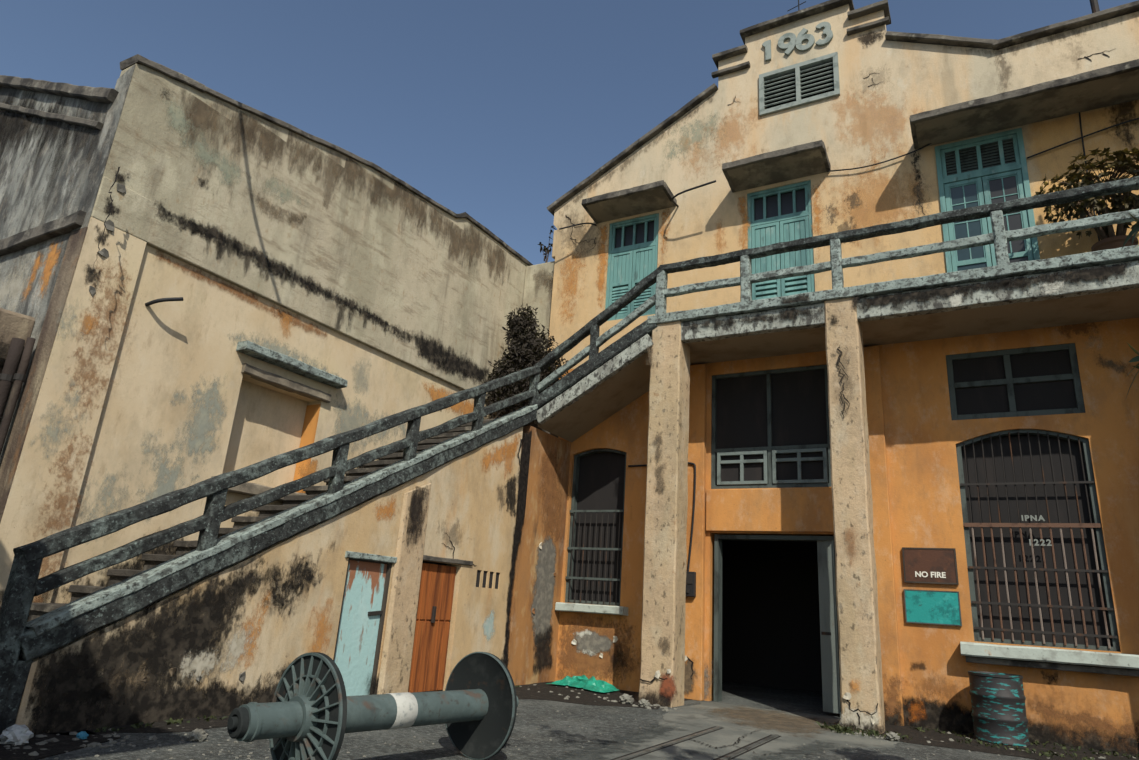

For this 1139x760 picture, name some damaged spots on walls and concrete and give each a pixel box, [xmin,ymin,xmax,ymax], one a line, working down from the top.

damp [0,95,96,154]
damp [183,96,507,277]
rust [23,243,60,298]
mould [155,203,489,384]
crack [837,347,850,418]
mould [62,539,183,595]
spalling [531,536,556,674]
damp [25,557,322,734]
spalling [571,630,618,658]
mould [367,676,379,695]
damp [884,678,974,734]
damp [1027,701,1139,755]